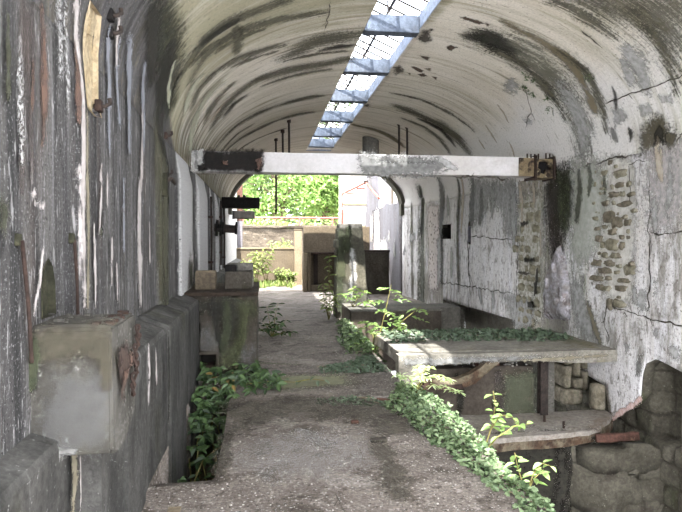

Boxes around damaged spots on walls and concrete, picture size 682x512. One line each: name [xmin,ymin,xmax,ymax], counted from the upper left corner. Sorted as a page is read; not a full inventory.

rust [19,0,48,193]
spalling [83,1,102,118]
leakage [106,16,133,155]
leakage [137,0,278,306]
leakage [284,44,356,62]
leakage [461,28,618,255]
leakage [545,0,652,98]
crack [606,76,681,104]
crack [439,194,530,320]
spalling [512,187,547,327]
spalling [589,152,649,314]
crack [584,155,682,342]